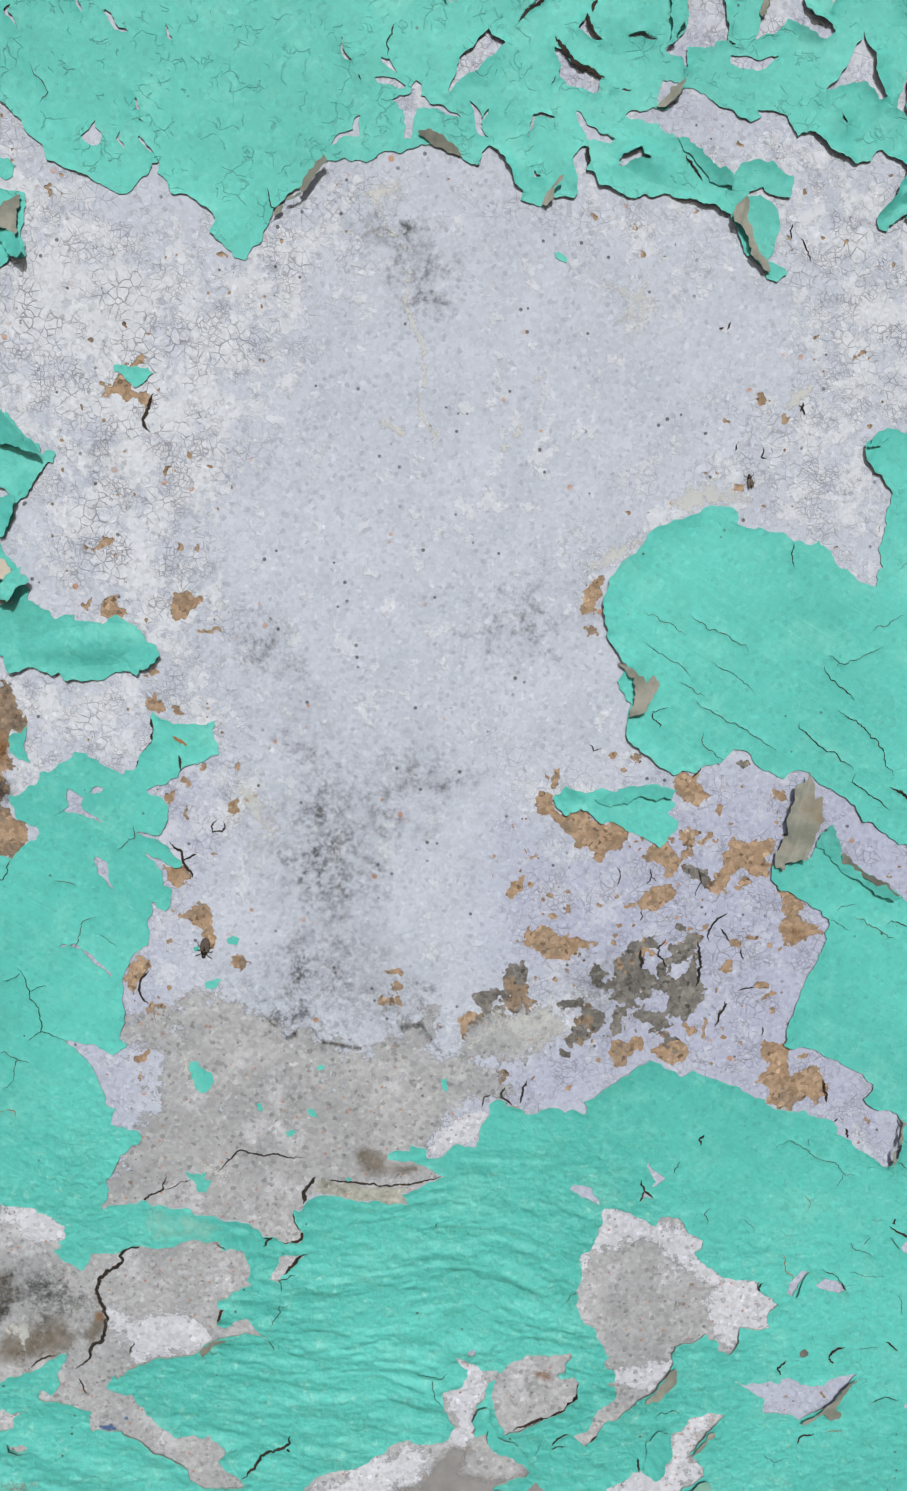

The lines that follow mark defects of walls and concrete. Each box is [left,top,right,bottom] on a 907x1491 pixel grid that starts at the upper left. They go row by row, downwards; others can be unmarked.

peeling [448,29,505,92]
peeling [665,0,735,67]
peeling [756,0,836,40]
peeling [827,33,907,116]
peeling [0,55,907,1243]
crack [646,614,907,809]
crack [0,968,64,1114]
water stain [0,1273,104,1358]
peeling [0,1204,267,1489]
peeling [563,1185,860,1446]
peeling [376,1349,579,1491]
peeling [640,1413,723,1491]